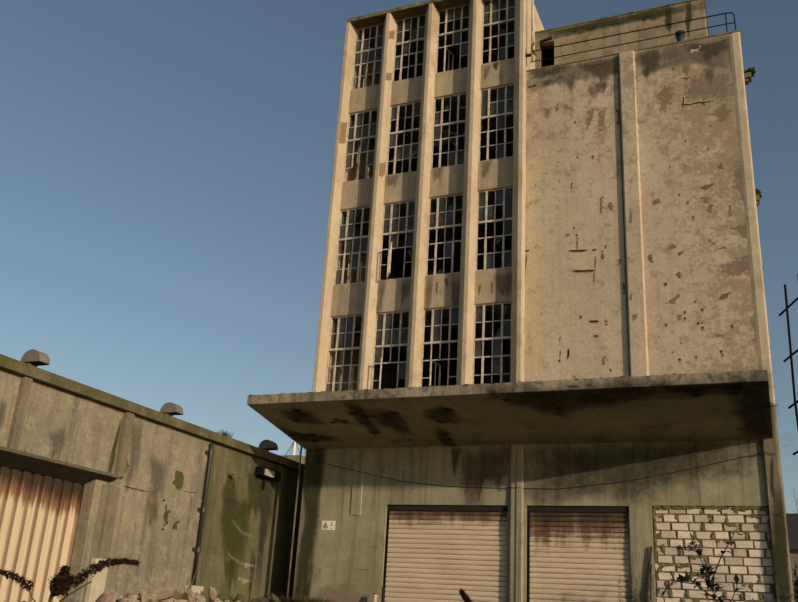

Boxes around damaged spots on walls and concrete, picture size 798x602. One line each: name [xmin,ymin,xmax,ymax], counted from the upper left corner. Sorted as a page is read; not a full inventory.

water stain [555,4,725,60]
water stain [583,59,616,94]
water stain [640,51,658,76]
spalling [701,182,714,213]
peeling [722,256,751,276]
water stain [349,405,407,433]
water stain [489,376,775,434]
water stain [439,432,509,502]
water stain [545,445,724,496]
water stain [222,475,271,592]